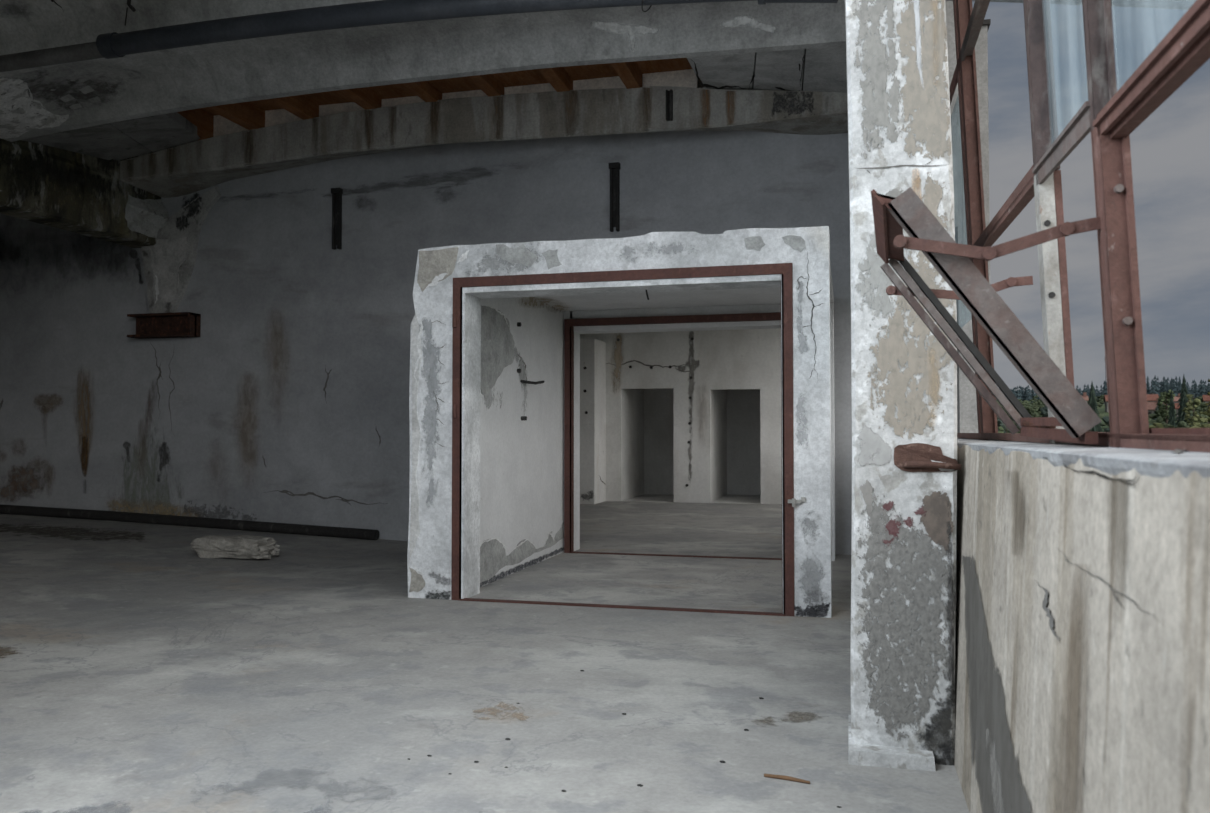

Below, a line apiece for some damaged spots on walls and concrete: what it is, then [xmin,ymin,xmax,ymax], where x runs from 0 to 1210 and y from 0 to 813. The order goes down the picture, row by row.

peeling [0,76,69,139]
peeling [853,0,954,229]
water stain [176,193,203,231]
spalling [541,249,562,269]
spalling [744,236,766,251]
spalling [782,235,806,252]
crack [797,253,824,379]
spalling [481,305,515,397]
corrosion [77,378,91,491]
water stain [0,466,43,501]
crack [263,457,388,505]
peeling [480,522,564,583]